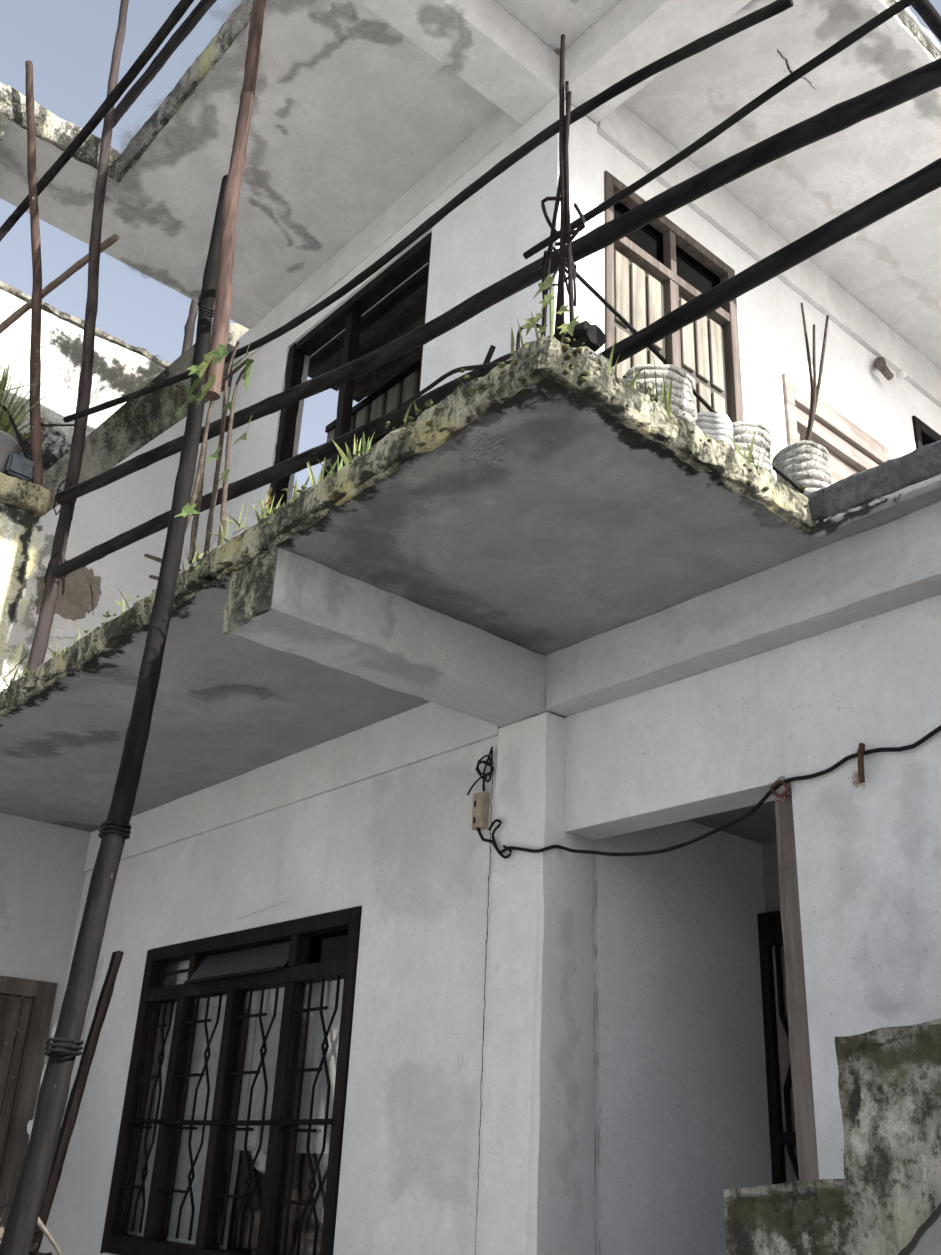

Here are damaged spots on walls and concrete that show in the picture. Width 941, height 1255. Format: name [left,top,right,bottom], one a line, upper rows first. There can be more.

crack [777,50,816,90]
water stain [49,322,165,396]
water stain [13,417,71,473]
mould [170,368,902,619]
water stain [0,504,42,637]
peeling [31,559,102,639]
water stain [0,617,150,726]
mould [843,1034,913,1128]
mould [728,1190,817,1255]